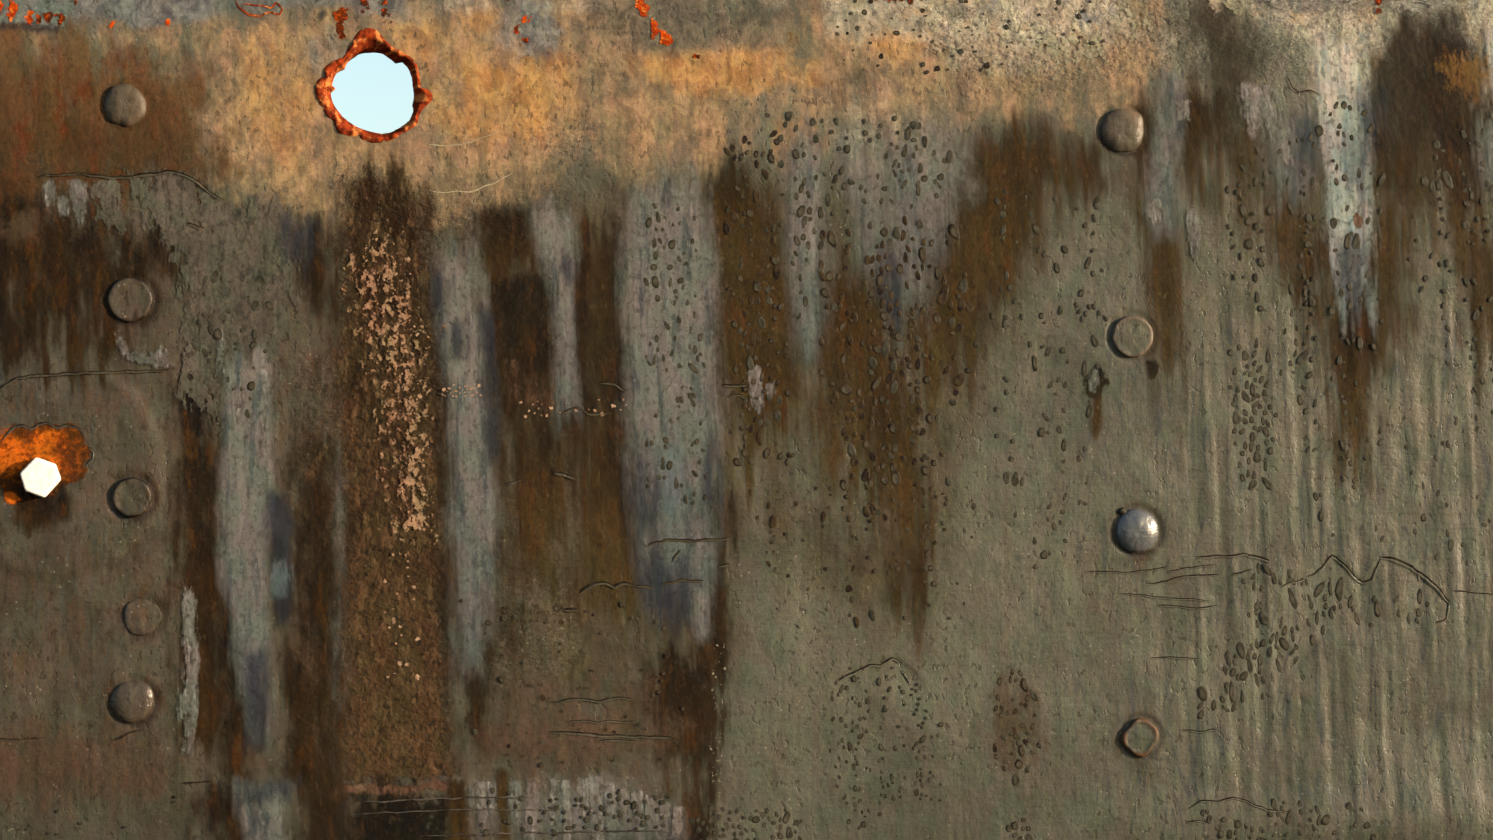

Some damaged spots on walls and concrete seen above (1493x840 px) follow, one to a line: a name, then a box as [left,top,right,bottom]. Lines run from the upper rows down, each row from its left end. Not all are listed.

corrosion [319,0,393,40]
corrosion [514,15,532,43]
corrosion [635,0,673,46]
leakage [1138,0,1493,484]
corrosion [0,423,91,537]
corrosion [295,157,462,824]
leakage [0,113,1103,840]